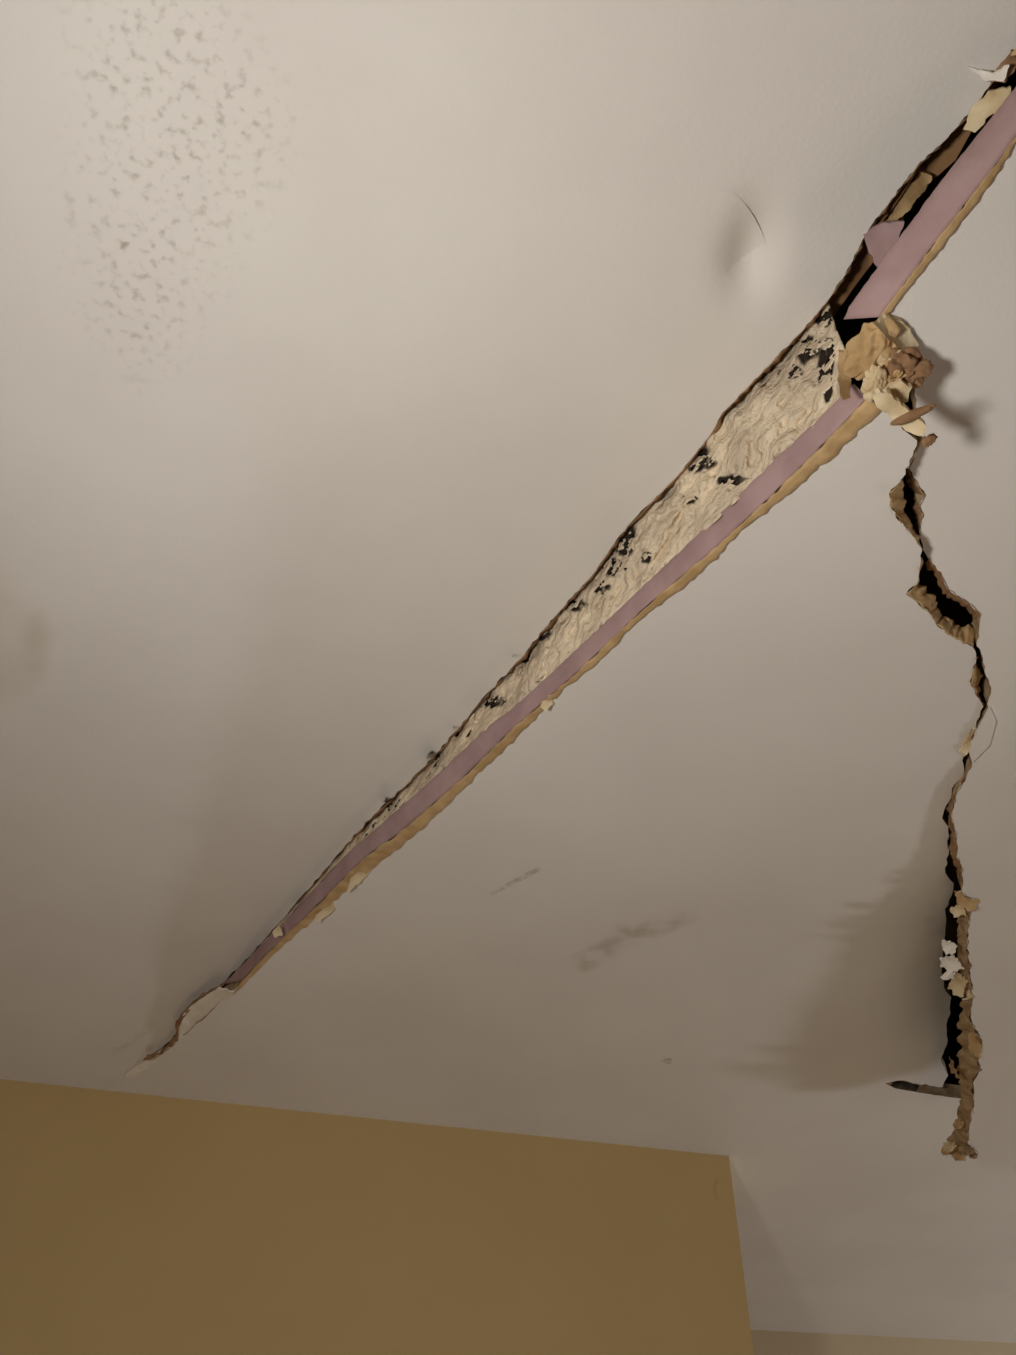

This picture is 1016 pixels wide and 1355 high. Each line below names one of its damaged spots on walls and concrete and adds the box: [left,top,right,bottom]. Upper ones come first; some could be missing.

crack [889,437,996,1161]